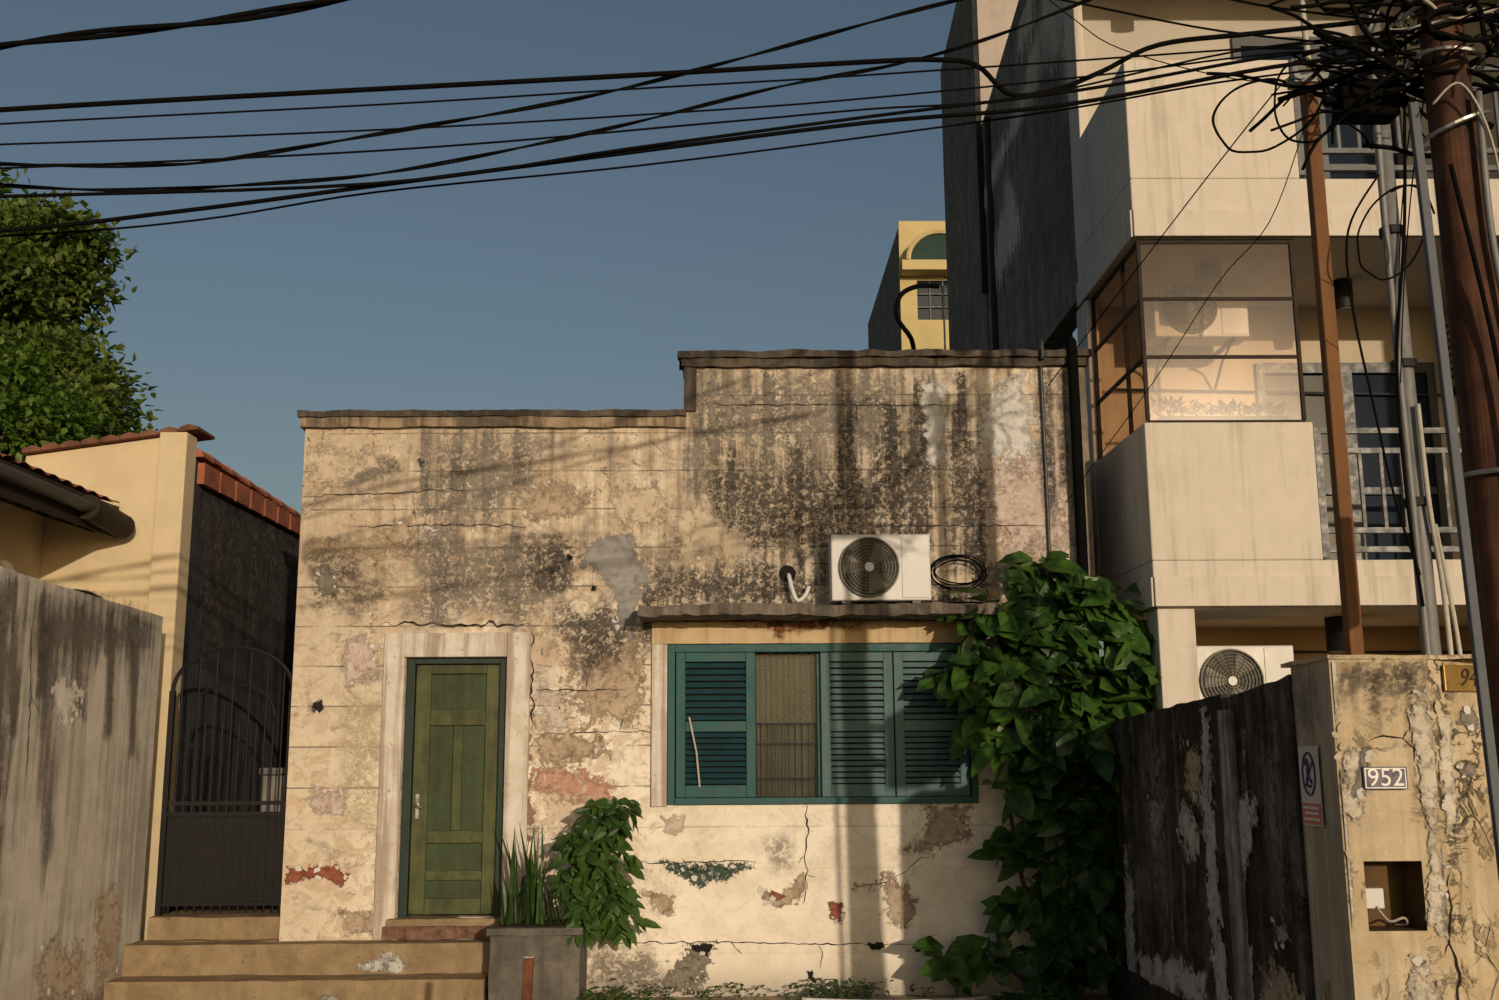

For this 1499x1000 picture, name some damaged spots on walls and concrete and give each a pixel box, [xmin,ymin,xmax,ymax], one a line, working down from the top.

water stain [0,578,154,866]
peeling [284,863,350,888]
peeling [334,906,374,938]
peeling [355,950,407,974]
water stain [193,427,579,672]
water stain [554,603,625,675]
peeling [638,857,807,917]
water stain [643,368,1011,642]
peeling [827,870,919,930]
peeling [1122,702,1232,1000]
peeling [1331,662,1372,926]
peeling [1406,682,1495,939]